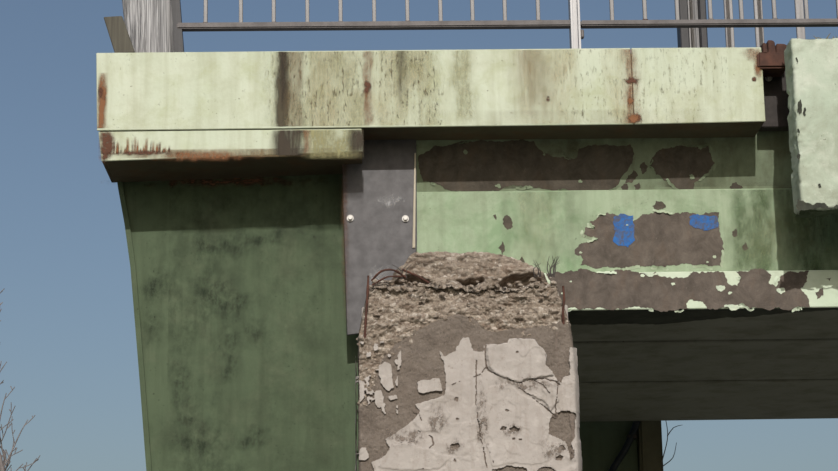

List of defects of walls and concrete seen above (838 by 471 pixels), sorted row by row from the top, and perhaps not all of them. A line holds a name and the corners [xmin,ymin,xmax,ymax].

corrosion [98,75,239,160]
corrosion [250,149,278,157]
water stain [275,52,356,157]
peeling [418,139,716,192]
corrosion [626,49,641,123]
spalling [355,201,838,471]
crack [408,409,434,448]
crack [452,344,575,471]